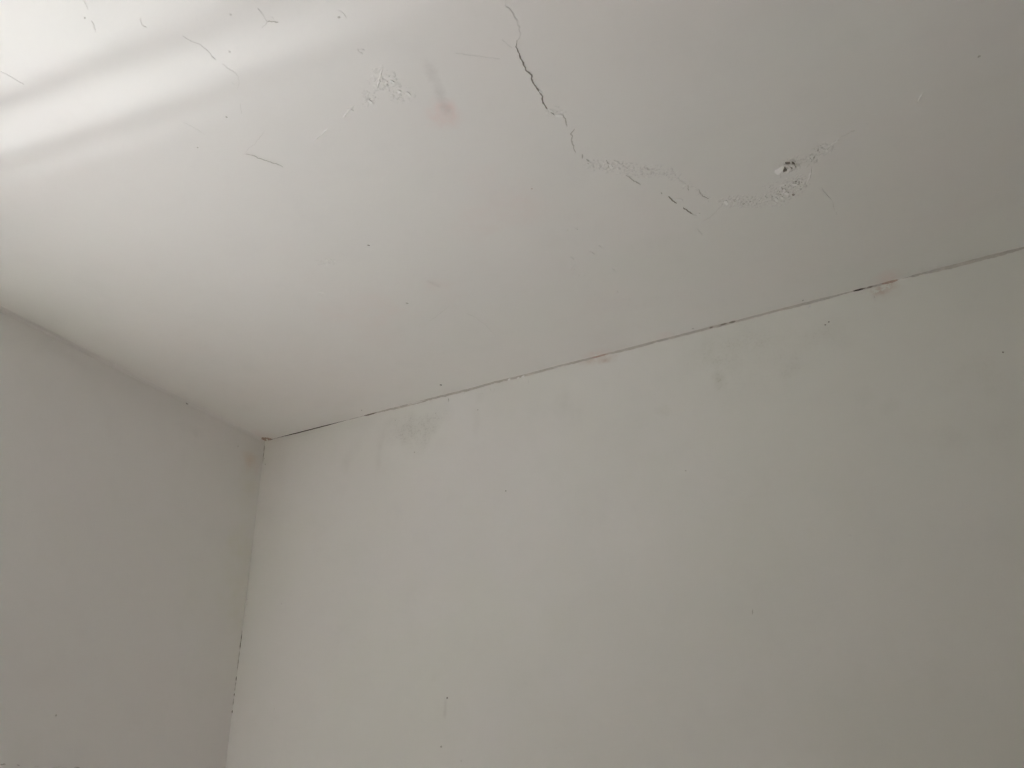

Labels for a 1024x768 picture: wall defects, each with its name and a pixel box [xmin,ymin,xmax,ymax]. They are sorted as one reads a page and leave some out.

crack [456,0,589,164]